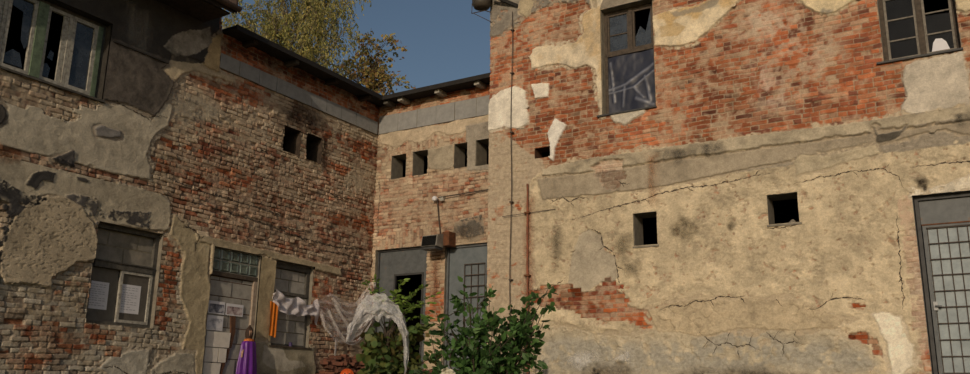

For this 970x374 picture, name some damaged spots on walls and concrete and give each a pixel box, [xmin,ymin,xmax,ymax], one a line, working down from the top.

peeling [652,0,737,46]
peeling [490,0,604,115]
spalling [0,69,109,122]
spalling [534,139,560,159]
spalling [529,277,678,330]
crack [660,296,745,310]
peeling [0,319,195,374]
crack [699,331,803,358]